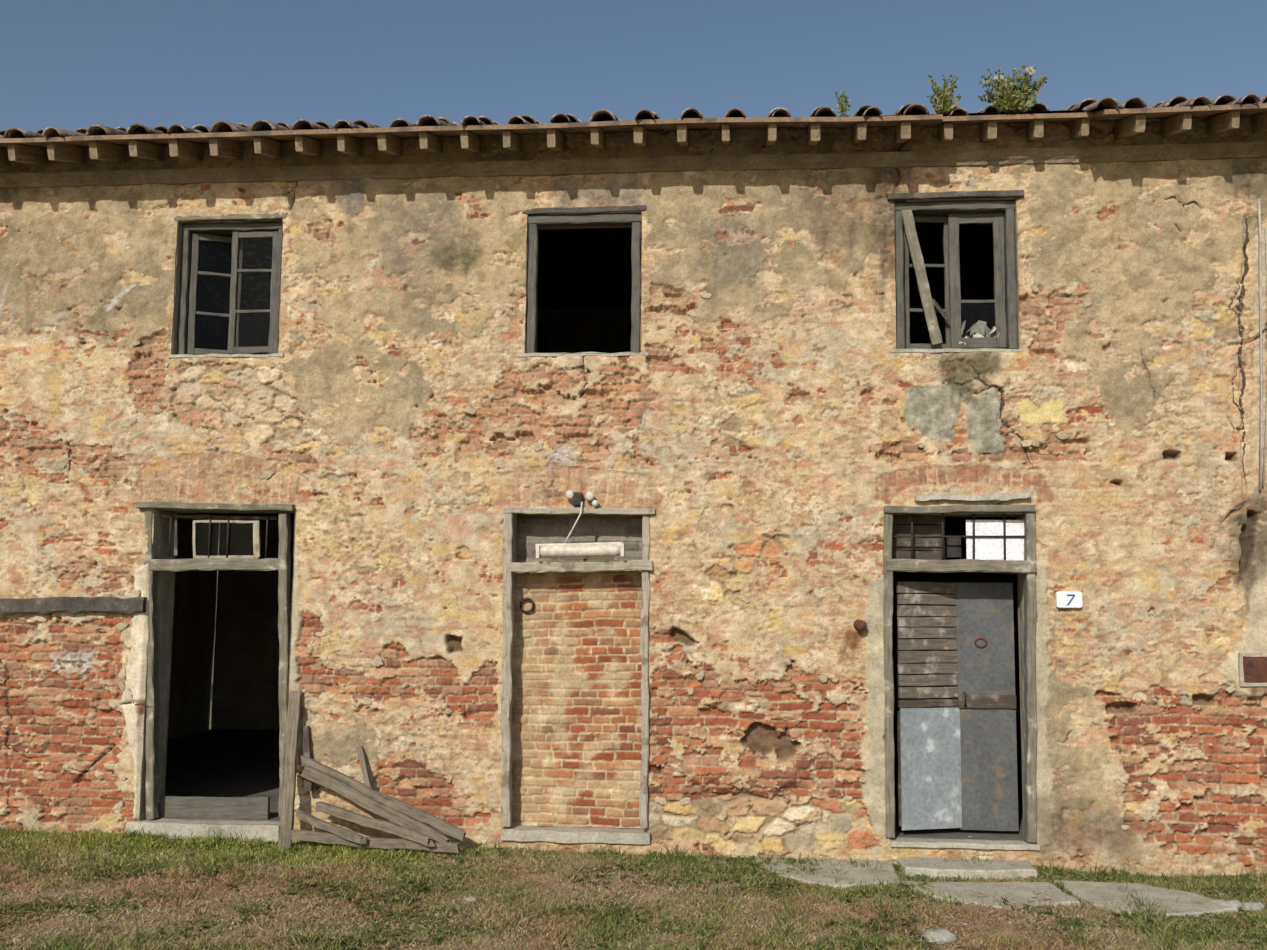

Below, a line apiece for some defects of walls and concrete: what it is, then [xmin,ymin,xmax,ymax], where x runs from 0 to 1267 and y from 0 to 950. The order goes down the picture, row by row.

crack [1165,196,1202,232]
spalling [405,342,685,468]
spalling [870,383,1094,471]
crack [1222,218,1267,523]
spalling [52,558,141,597]
spalling [0,612,129,831]
spalling [296,607,502,732]
spalling [370,759,490,828]
spalling [647,625,882,853]
spalling [1088,684,1267,873]